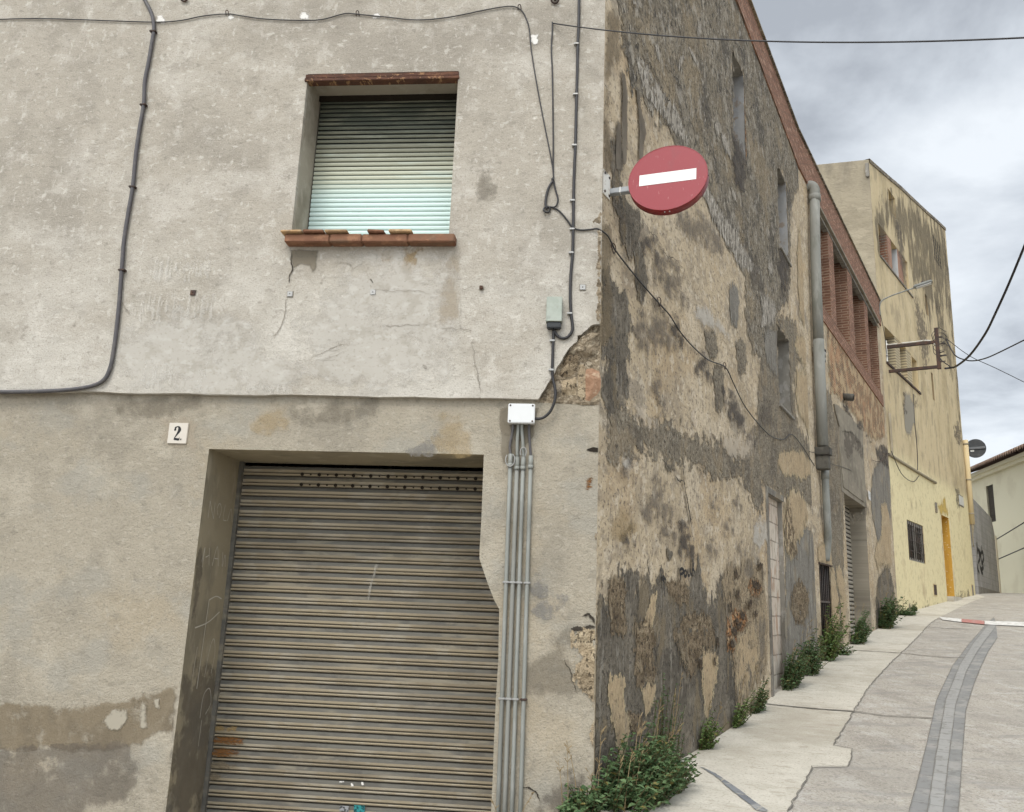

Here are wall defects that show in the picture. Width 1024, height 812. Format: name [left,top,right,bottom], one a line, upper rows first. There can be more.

crack [276,252,293,335]
peeling [536,0,812,561]
flaking render [790,579,810,627]
flaking render [570,627,595,707]
flaking render [605,552,769,756]
leakage [0,688,175,751]
rust [212,726,244,757]